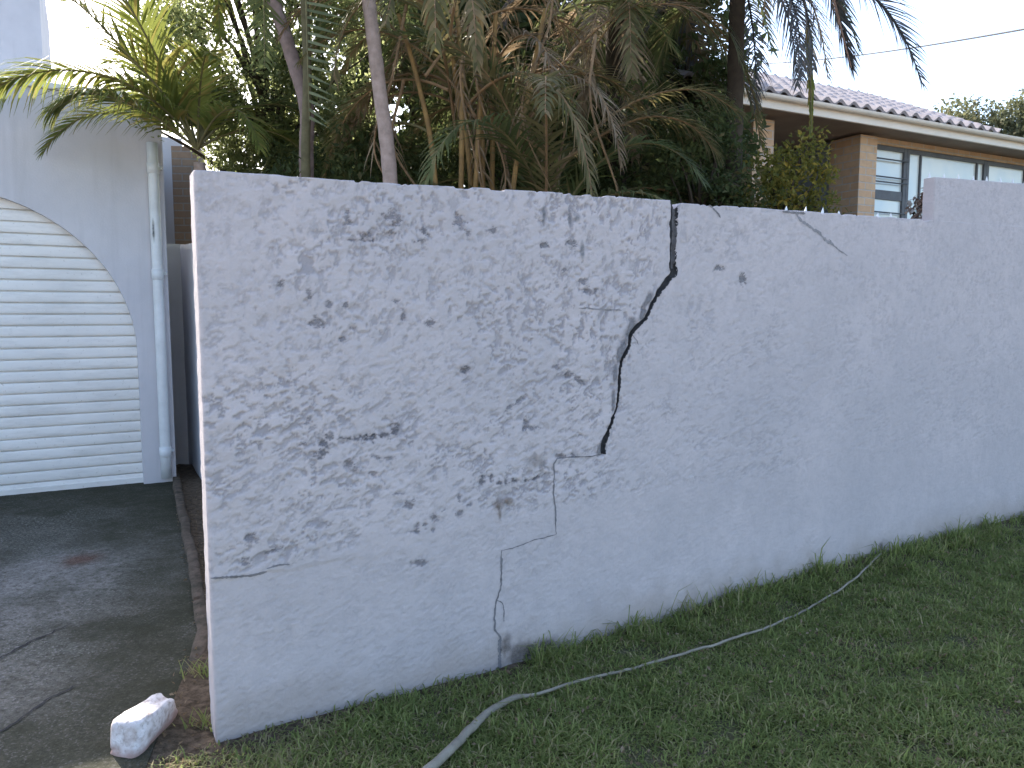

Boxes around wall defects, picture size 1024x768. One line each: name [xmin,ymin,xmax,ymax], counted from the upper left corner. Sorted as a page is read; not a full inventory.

crack [493,200,678,669]
crack [782,210,848,256]